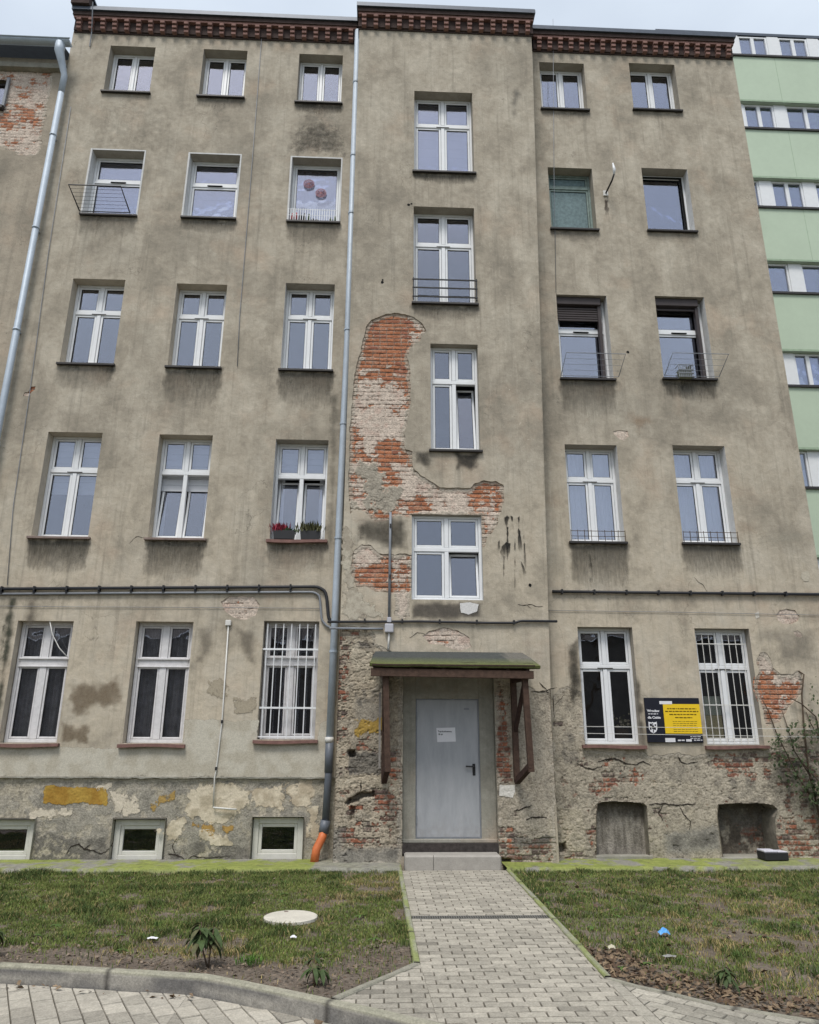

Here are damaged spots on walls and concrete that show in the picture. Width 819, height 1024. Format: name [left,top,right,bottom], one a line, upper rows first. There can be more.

spalling [0,71,53,156]
spalling [348,313,504,548]
water stain [498,516,526,569]
spalling [341,526,412,620]
spalling [423,627,471,651]
water stain [72,683,118,713]
spalling [753,652,802,726]
water stain [63,727,87,742]
crack [577,758,650,770]
flaking render [28,780,320,846]
crack [649,803,694,829]
crack [67,843,113,854]